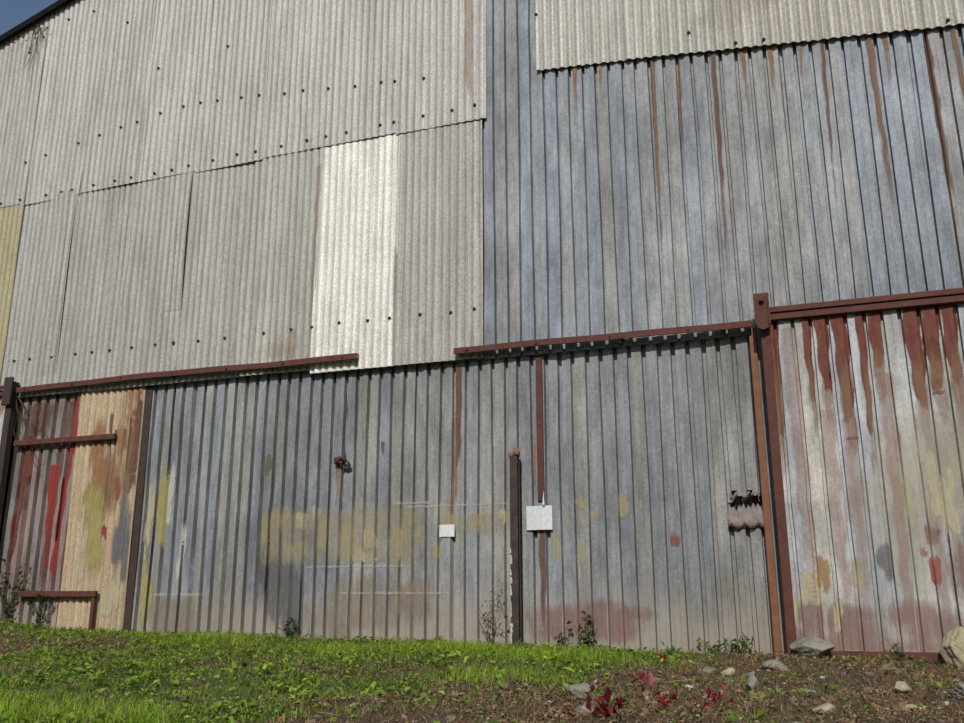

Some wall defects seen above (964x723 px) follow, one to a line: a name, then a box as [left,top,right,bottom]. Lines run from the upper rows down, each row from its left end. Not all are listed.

corrosion [650,58,658,177]
corrosion [710,51,726,227]
corrosion [820,40,832,146]
corrosion [865,34,891,174]
corrosion [922,30,950,176]
corrosion [951,27,964,97]
corrosion [6,402,55,561]
corrosion [85,386,143,505]
corrosion [450,364,462,511]
corrosion [770,321,784,435]
corrosion [801,311,884,434]
corrosion [902,304,962,410]